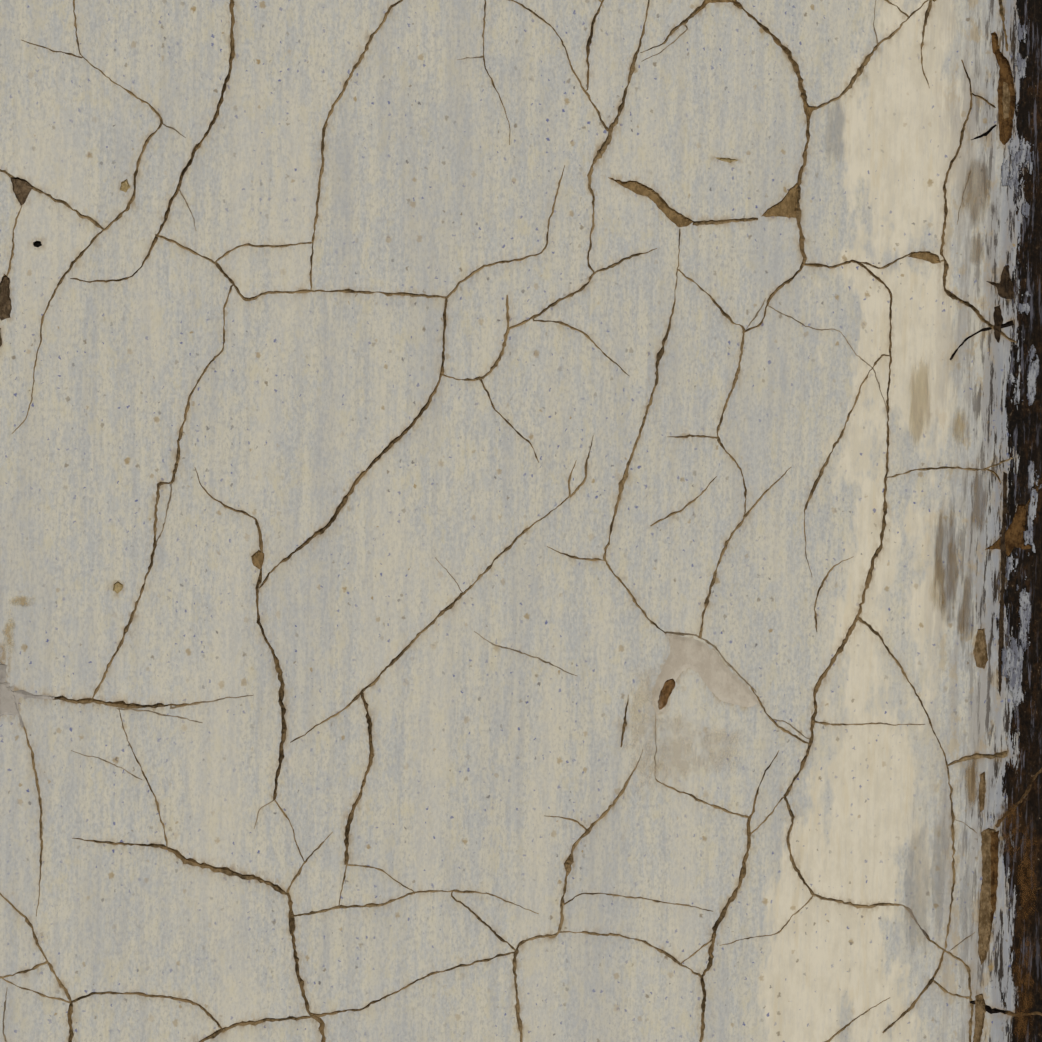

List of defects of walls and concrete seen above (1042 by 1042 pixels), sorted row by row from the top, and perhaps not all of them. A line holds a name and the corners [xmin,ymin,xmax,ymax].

crack [640,6,705,62]
crack [734,2,807,103]
crack [814,0,936,110]
peeling [991,23,1034,218]
spalling [608,177,798,228]
crack [940,60,1016,360]
spalling [0,274,12,346]
peeling [987,265,1031,343]
crack [0,0,657,1042]
crack [512,114,1013,1042]
peeling [973,461,1042,706]
peeling [978,828,999,965]